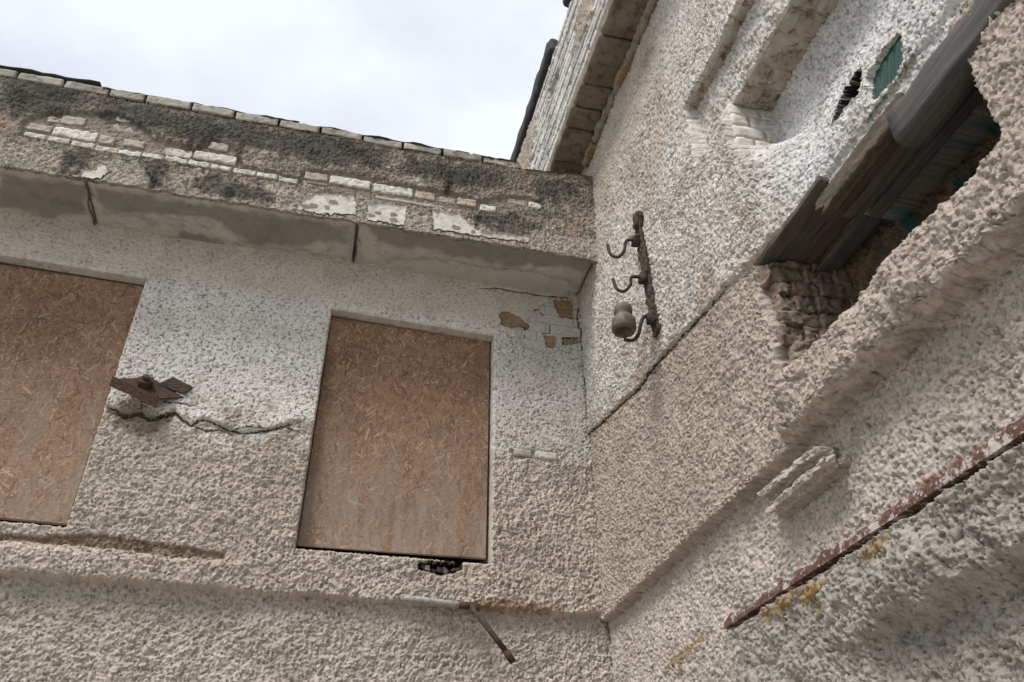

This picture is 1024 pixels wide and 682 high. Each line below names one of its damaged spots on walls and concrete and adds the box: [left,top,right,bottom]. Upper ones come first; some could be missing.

spalling [18,110,543,242]
crack [85,184,99,226]
crack [353,219,361,263]
peeling [499,299,580,351]
crack [589,282,733,438]
crack [109,401,306,436]
hole [418,561,463,576]
corrosion [759,572,831,627]